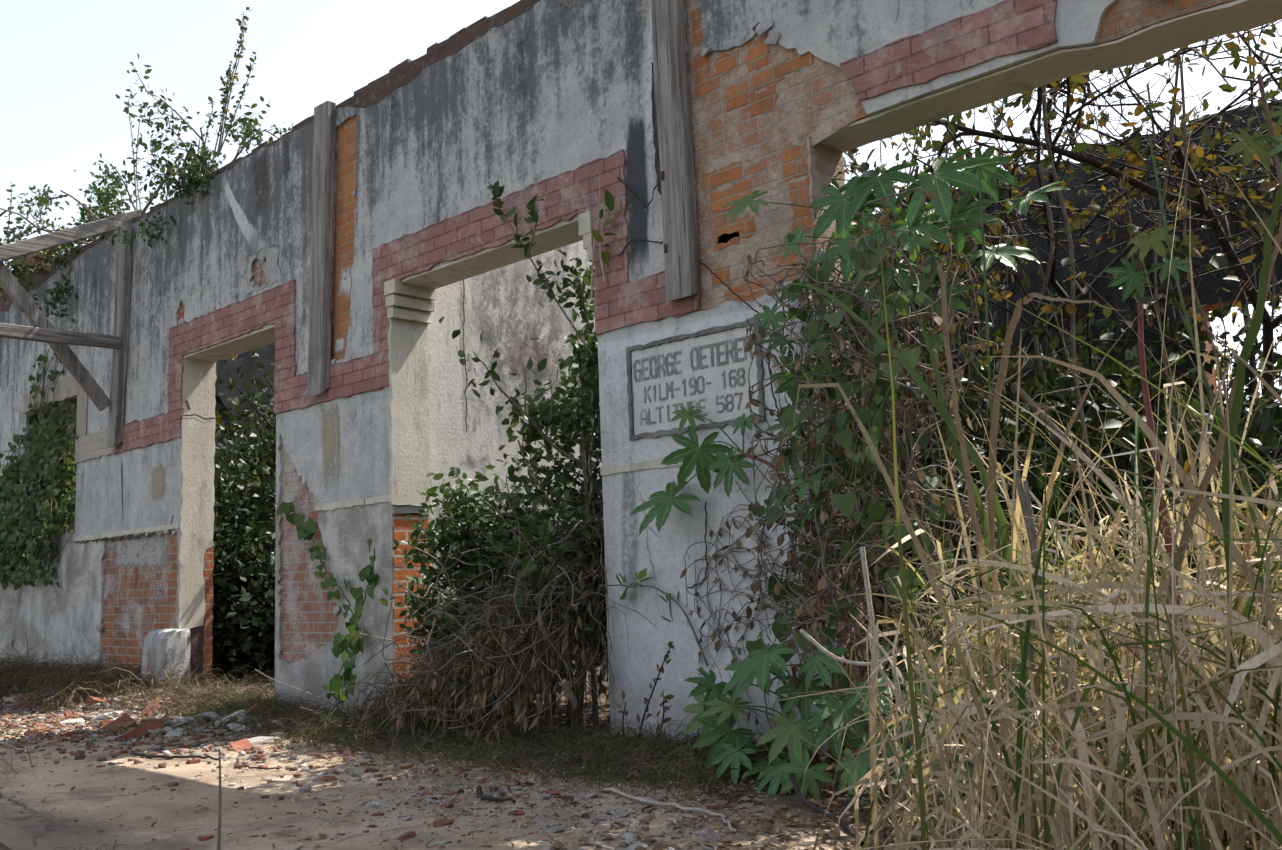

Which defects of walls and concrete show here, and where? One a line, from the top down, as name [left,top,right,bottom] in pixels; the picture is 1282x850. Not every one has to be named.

flaking render [1087,0,1232,46]
flaking render [330,117,357,364]
leakage [340,268,352,293]
leakage [626,120,648,264]
flaking render [684,0,869,311]
flaking render [96,529,178,679]
flaking render [276,440,340,664]